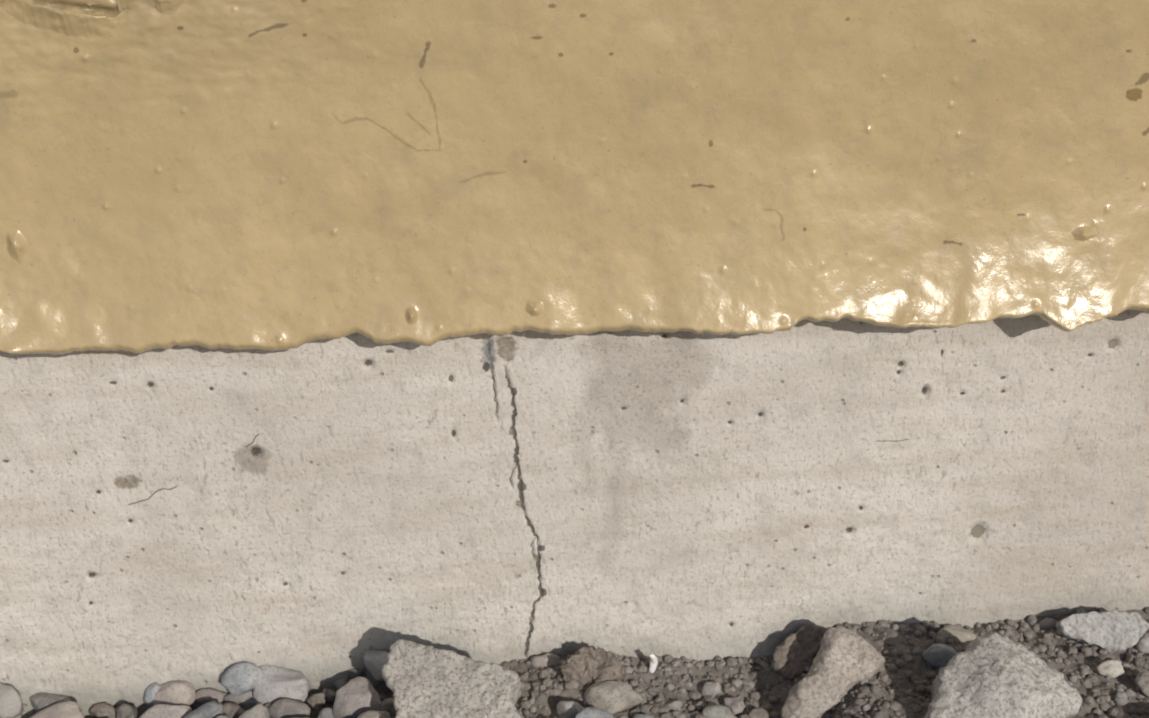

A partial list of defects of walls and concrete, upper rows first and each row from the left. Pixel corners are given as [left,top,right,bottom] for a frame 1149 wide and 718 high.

spalling [482,337,514,371]
spalling [115,478,139,488]
crack [487,345,547,655]
spalling [971,524,986,538]